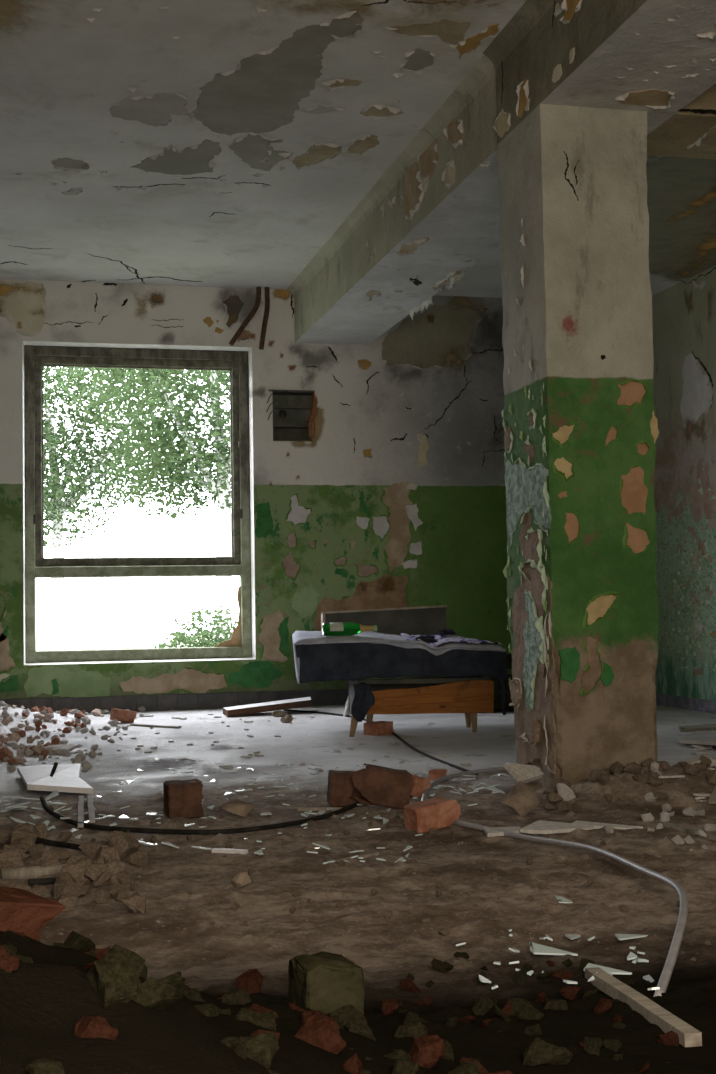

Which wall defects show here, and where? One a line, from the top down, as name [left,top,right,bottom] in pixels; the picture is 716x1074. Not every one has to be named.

crack [362,0,457,8]
peeling [390,19,500,78]
peeling [552,47,575,83]
peeling [554,0,583,24]
peeling [109,10,379,194]
peeling [493,79,530,138]
crack [563,151,580,201]
damp [646,156,716,281]
crack [46,254,203,327]
crack [390,348,505,467]
peeling [617,379,659,553]
peeling [501,383,619,774]